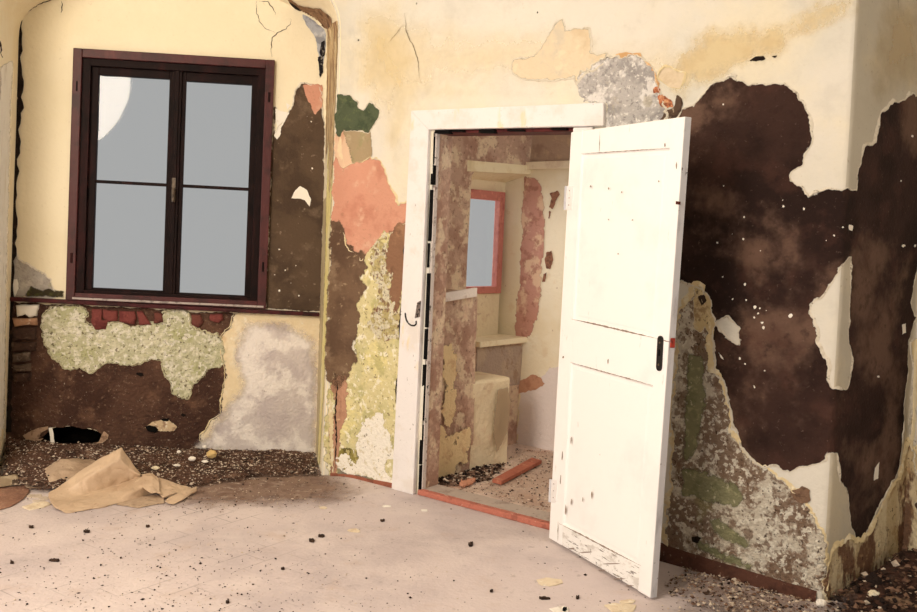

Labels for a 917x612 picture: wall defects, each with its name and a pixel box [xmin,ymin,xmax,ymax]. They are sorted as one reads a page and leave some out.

crack [256,1,291,54]
leakage [375,25,425,74]
leakage [678,29,783,83]
peeling [5,0,407,510]
peeling [476,177,560,394]
peeling [511,19,917,600]